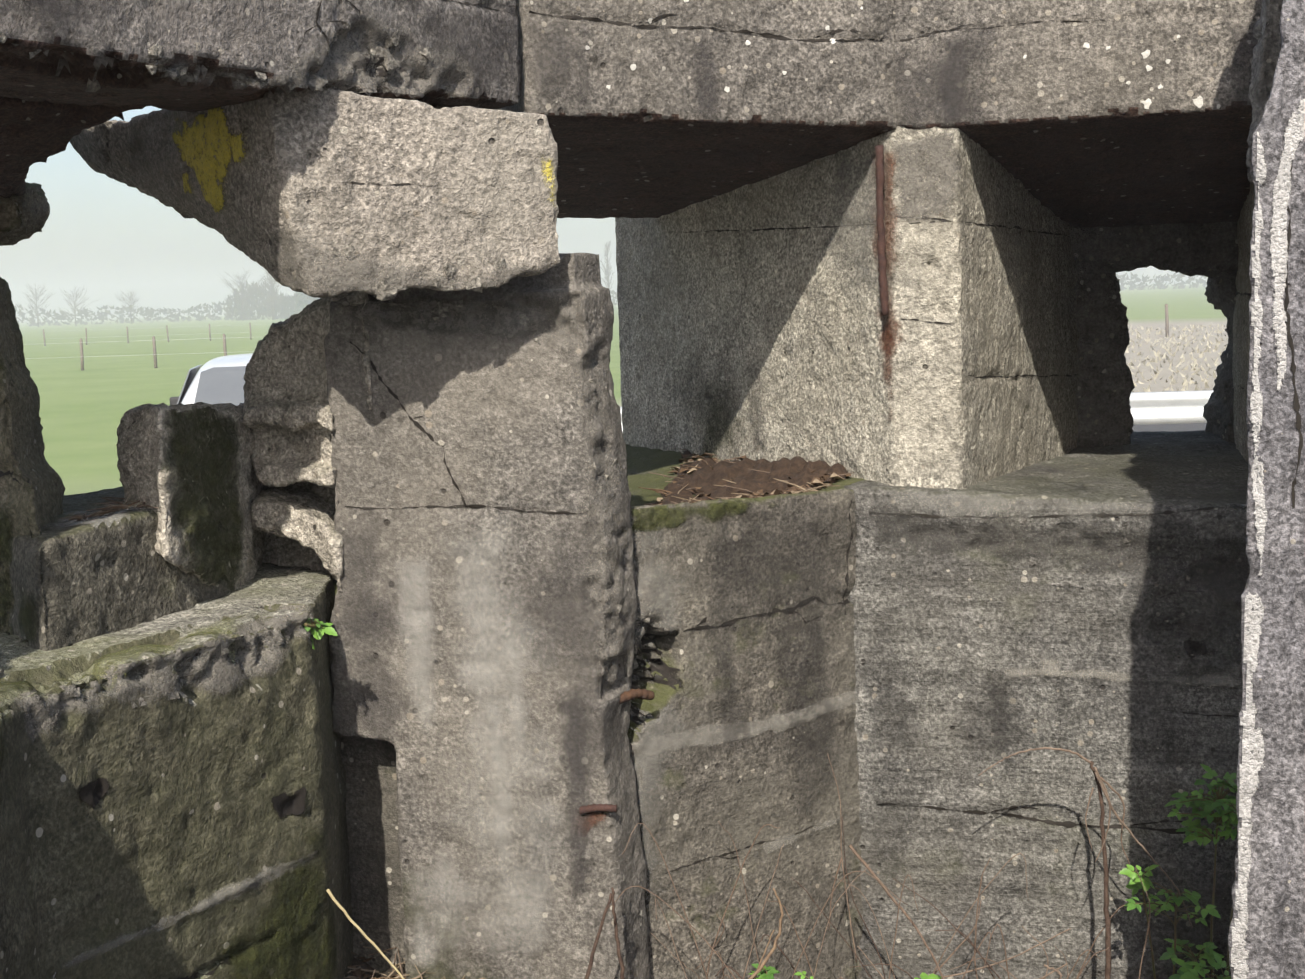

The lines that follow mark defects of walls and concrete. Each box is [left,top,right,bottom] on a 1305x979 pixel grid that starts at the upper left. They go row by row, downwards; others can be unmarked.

corrosion [870,154,894,274]
corrosion [879,310,897,381]
crack [344,341,586,517]
crack [659,500,1245,635]
crack [877,803,1237,838]